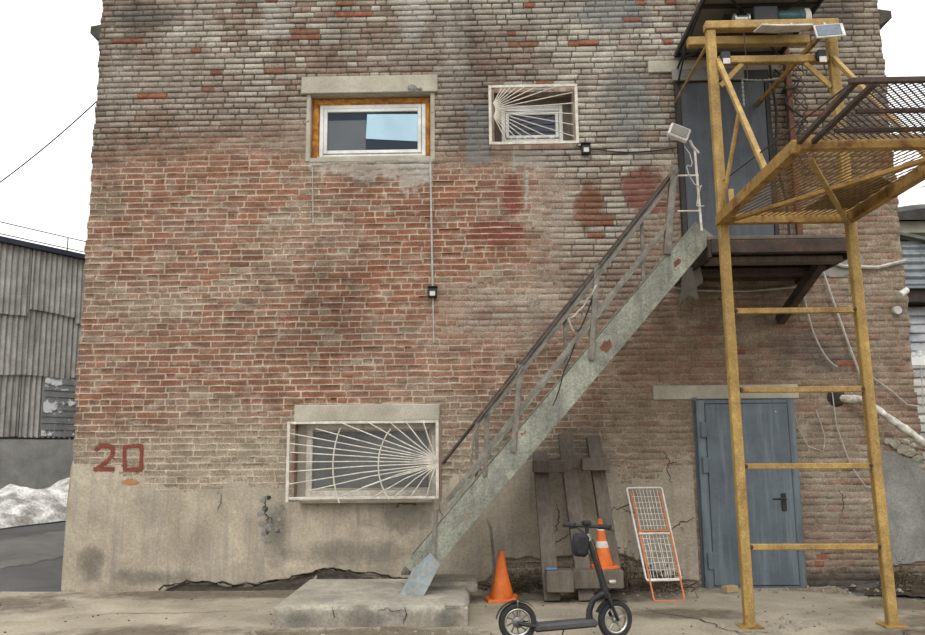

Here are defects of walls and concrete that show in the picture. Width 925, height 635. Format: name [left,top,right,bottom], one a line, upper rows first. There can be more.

peeling [911,350,925,365]
peeling [43,377,77,414]